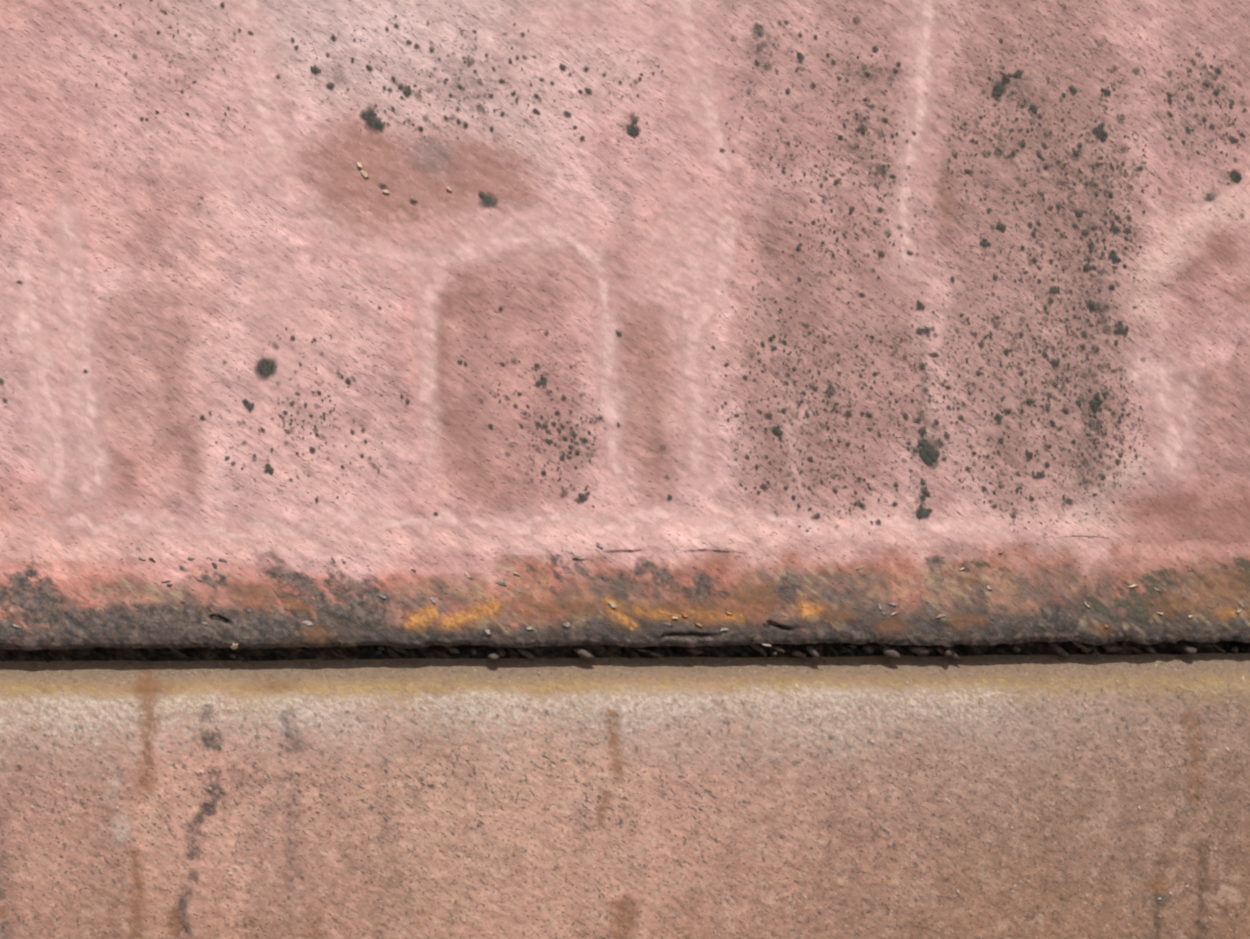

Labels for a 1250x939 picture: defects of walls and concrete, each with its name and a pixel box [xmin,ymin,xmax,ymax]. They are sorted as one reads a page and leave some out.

water stain [0,0,1200,541]
corrosion [405,601,500,628]
corrosion [604,591,770,629]
corrosion [799,599,822,617]
water stain [177,772,222,935]